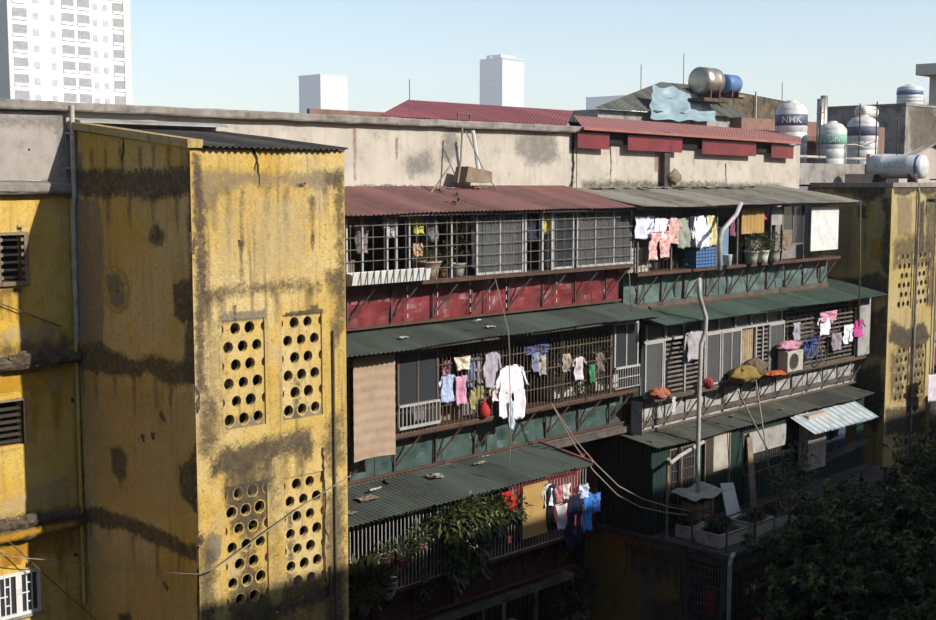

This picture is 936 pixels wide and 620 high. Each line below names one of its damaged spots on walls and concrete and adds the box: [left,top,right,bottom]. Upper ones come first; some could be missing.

crack [252,148,260,187]
water stain [517,133,556,163]
water stain [810,187,936,305]
water stain [0,151,347,620]